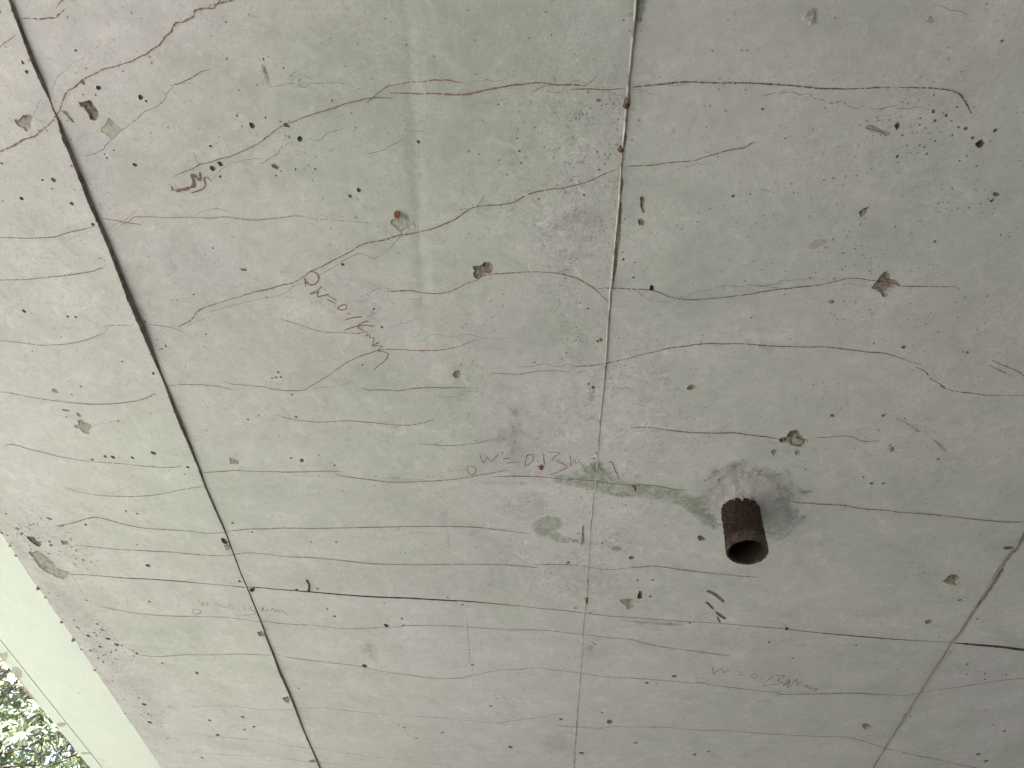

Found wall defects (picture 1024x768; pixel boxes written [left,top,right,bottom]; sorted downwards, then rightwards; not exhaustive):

crack [0,0,234,156]
spalling [14,114,32,132]
peeling [78,100,122,140]
crack [175,76,972,178]
spalling [472,262,493,279]
crack [0,140,1017,446]
spalling [871,272,899,297]
spalling [771,430,808,456]
spalling [27,536,69,579]